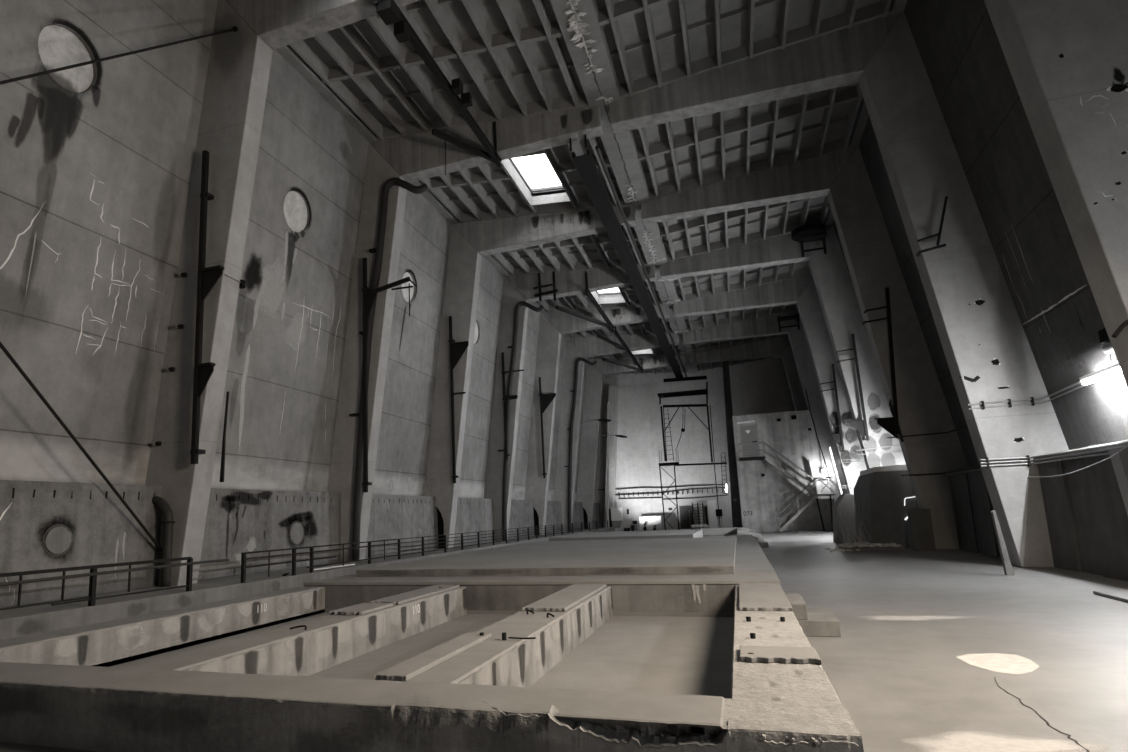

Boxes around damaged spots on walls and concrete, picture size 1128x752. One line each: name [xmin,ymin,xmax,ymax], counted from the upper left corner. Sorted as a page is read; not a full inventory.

water stain [8,19,102,161]
spalling [1106,82,1128,94]
crack [0,205,61,269]
crack [76,173,164,355]
water stain [253,267,268,329]
water stain [283,187,312,283]
water stain [239,345,250,447]
water stain [222,491,272,575]
spalling [548,713,730,749]
crack [994,678,1090,752]